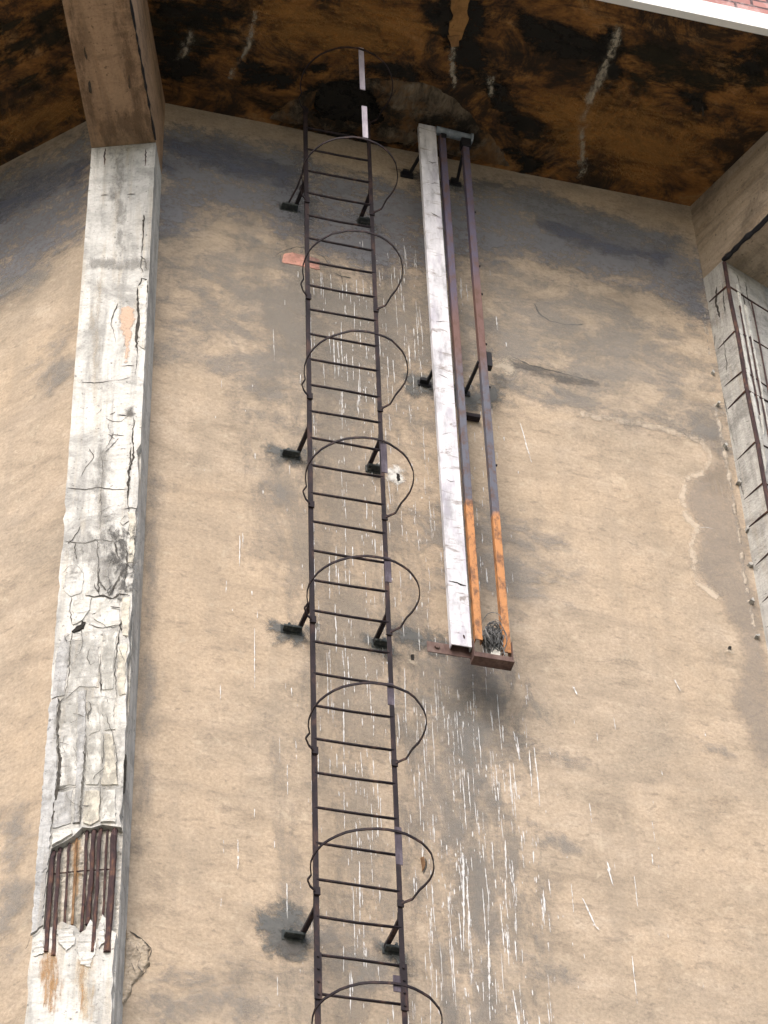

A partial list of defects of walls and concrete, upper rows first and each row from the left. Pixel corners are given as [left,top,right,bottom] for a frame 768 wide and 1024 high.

peeling [111,279,148,366]
leakage [149,0,329,112]
flaking render [280,252,320,270]
leakage [365,0,768,326]
leakage [449,282,718,599]
spalling [34,597,152,1005]
crack [51,410,137,827]
leakage [311,503,559,1024]
rust [41,952,59,1011]